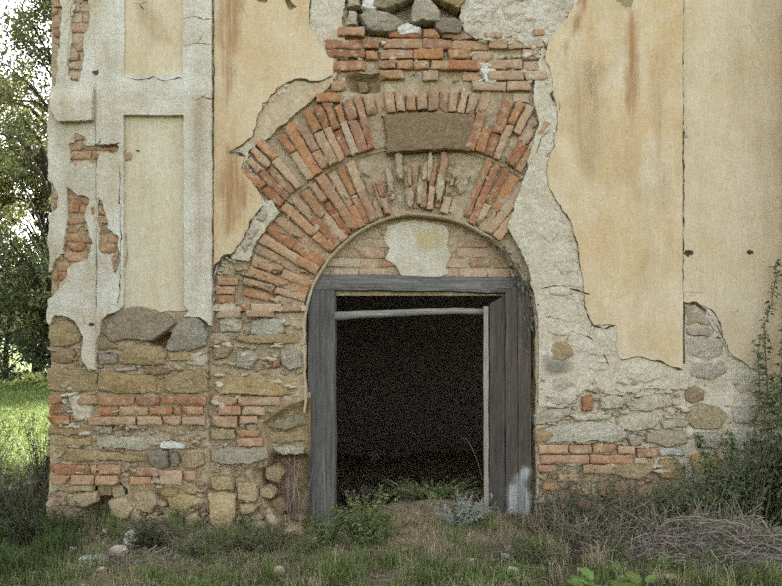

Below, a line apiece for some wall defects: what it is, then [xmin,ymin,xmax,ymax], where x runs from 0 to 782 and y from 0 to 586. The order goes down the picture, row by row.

spalling [51,0,99,87]
spalling [68,129,140,170]
spalling [46,183,312,531]
flaking render [230,0,782,516]